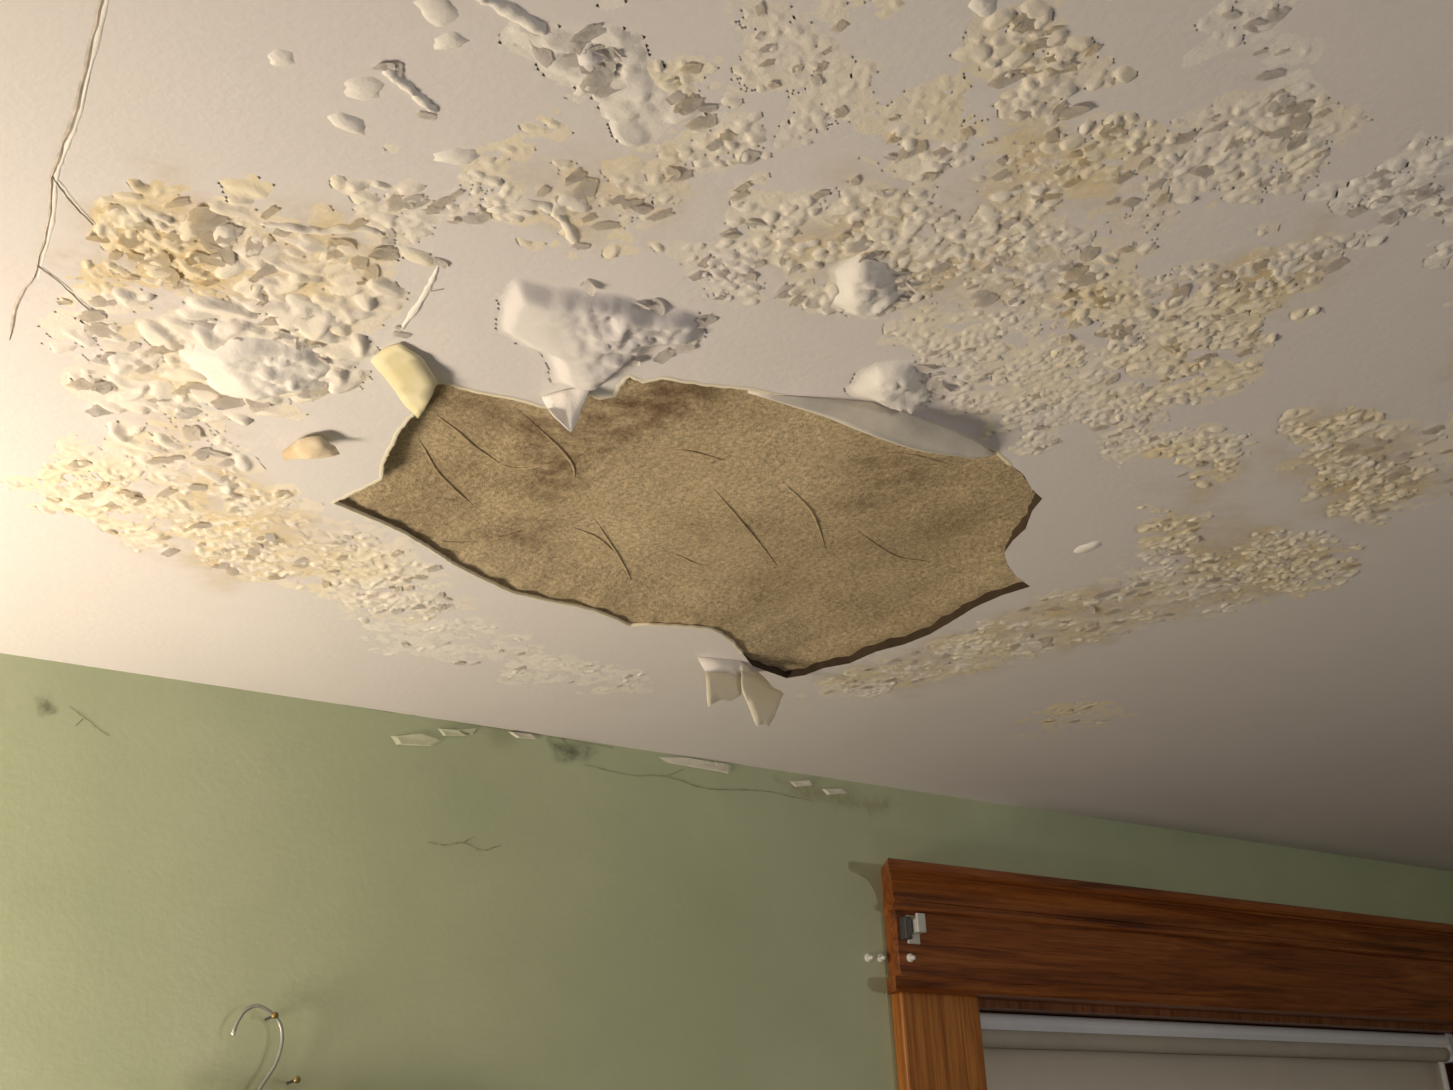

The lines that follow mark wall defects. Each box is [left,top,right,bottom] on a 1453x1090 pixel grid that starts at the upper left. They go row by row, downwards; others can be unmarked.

crack [9,0,109,340]
flaking render [0,0,1453,726]